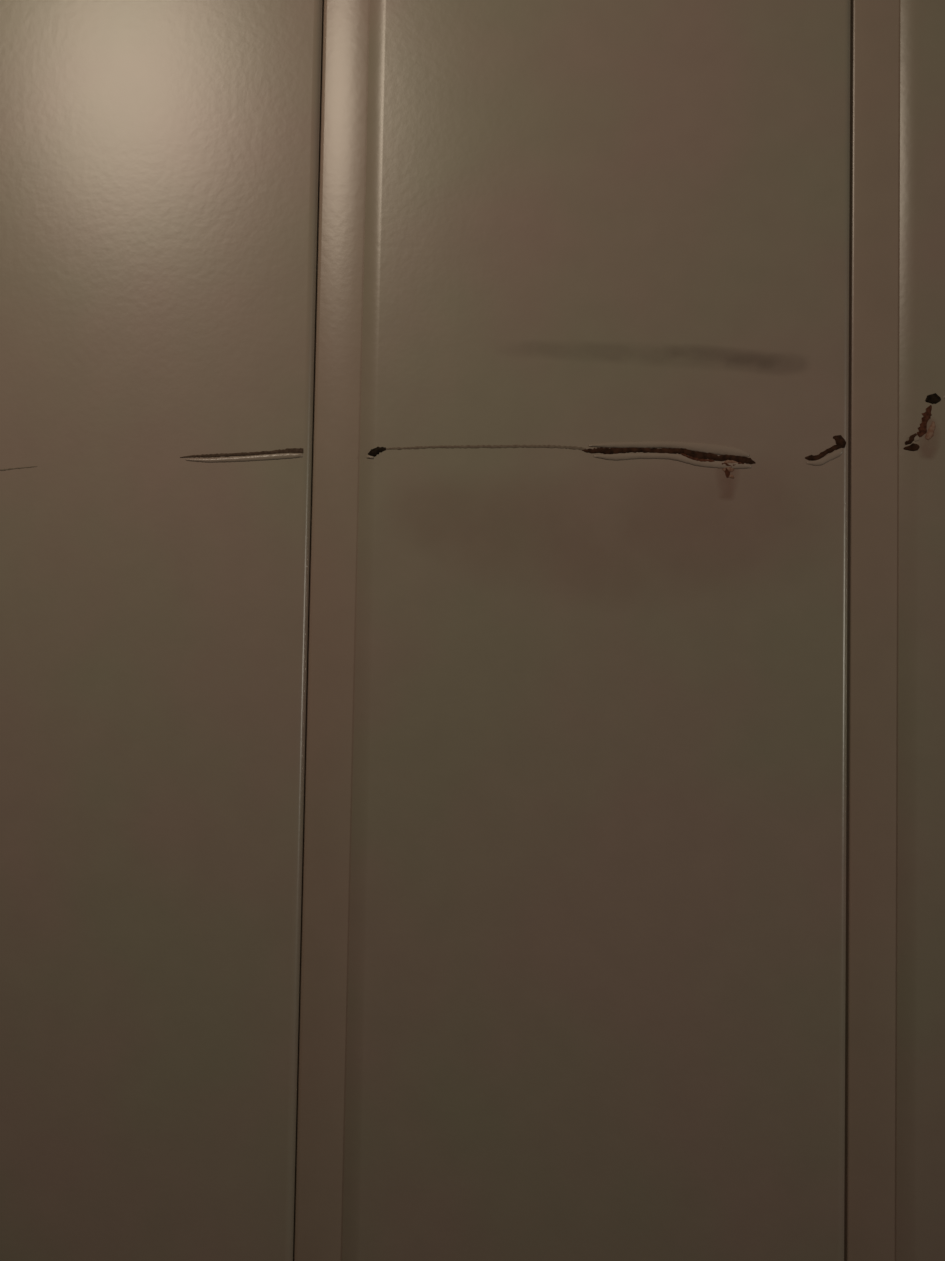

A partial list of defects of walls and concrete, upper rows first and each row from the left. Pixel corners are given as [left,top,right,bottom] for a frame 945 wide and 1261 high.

crack [180,448,303,463]
crack [366,441,756,479]
crack [805,435,846,466]